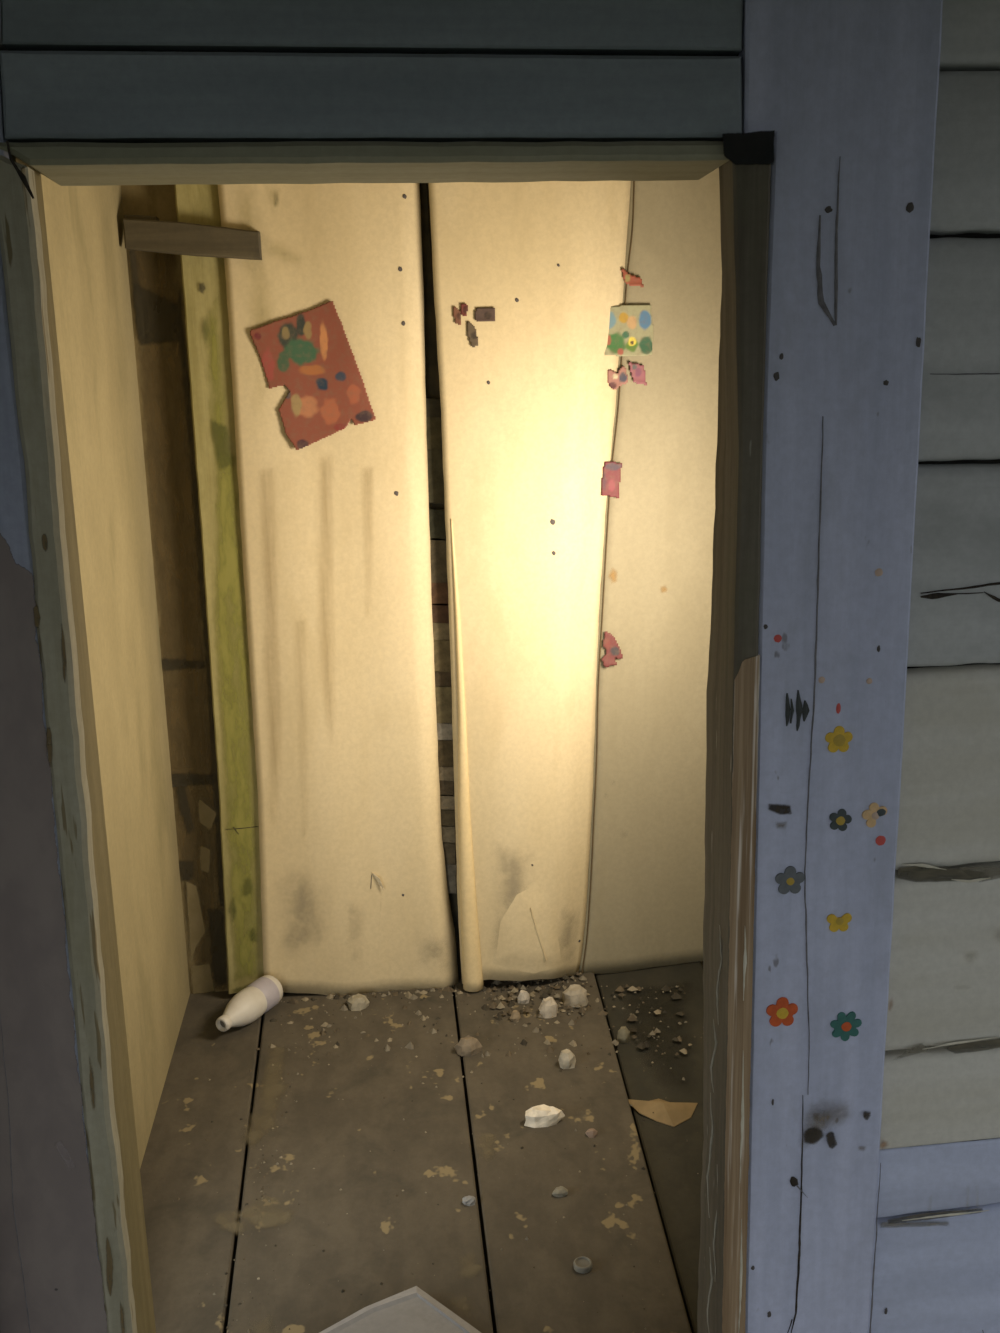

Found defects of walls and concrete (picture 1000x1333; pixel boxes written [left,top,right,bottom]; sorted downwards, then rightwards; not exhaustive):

water stain [212,402,256,991]
crack [787,416,824,1333]
crack [920,582,1000,602]
peeling [106,1238,125,1333]